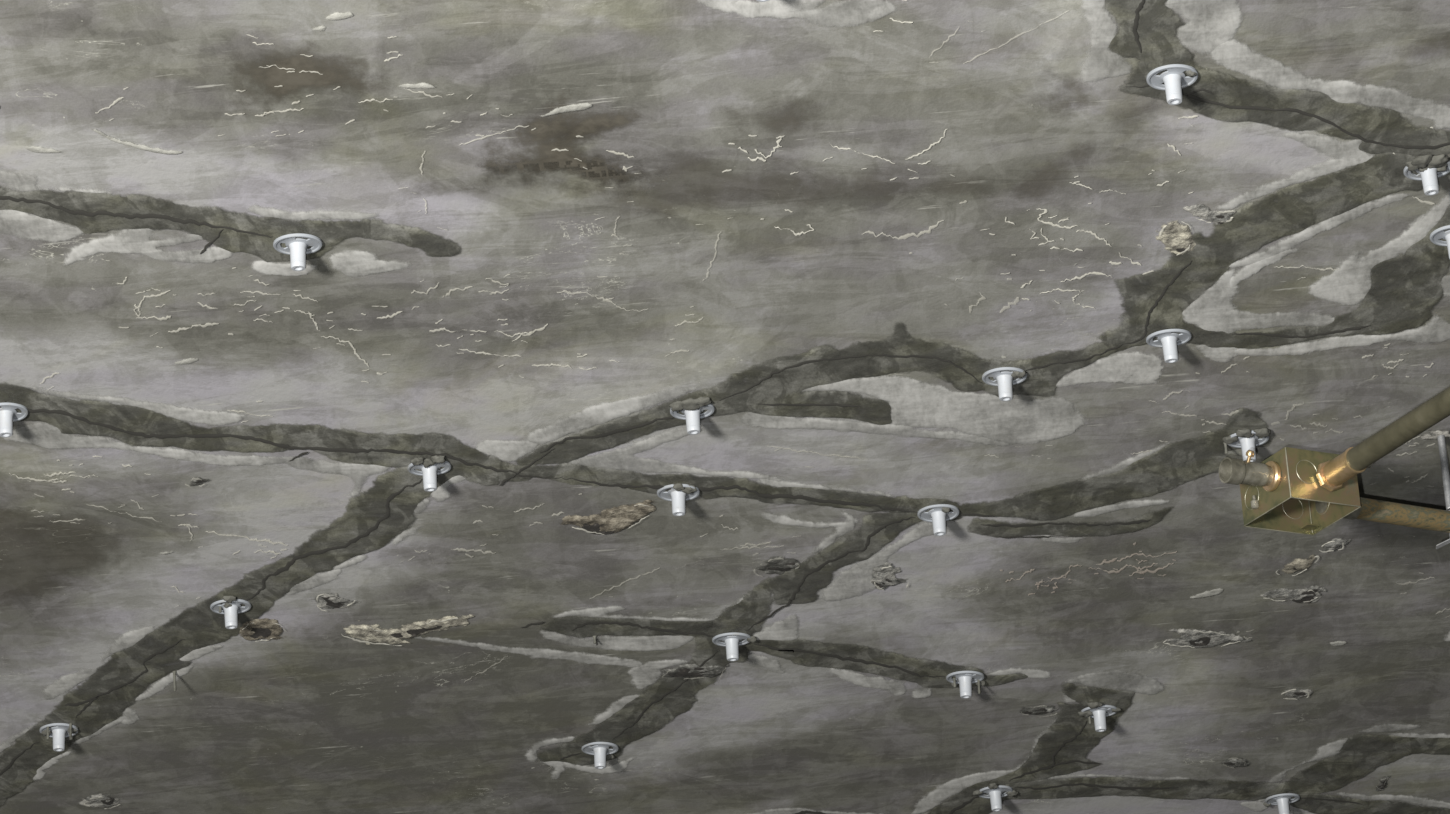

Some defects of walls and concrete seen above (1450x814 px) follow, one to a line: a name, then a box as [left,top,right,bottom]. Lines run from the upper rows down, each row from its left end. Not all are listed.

water stain [486,105,639,184]
crack [0,171,461,277]
crack [526,0,1450,452]
spalling [1156,204,1236,255]
spalling [561,500,656,535]
spalling [239,618,286,642]
spalling [314,593,474,645]
crack [0,384,1268,806]
crack [911,670,1450,814]
crack [749,806,881,814]